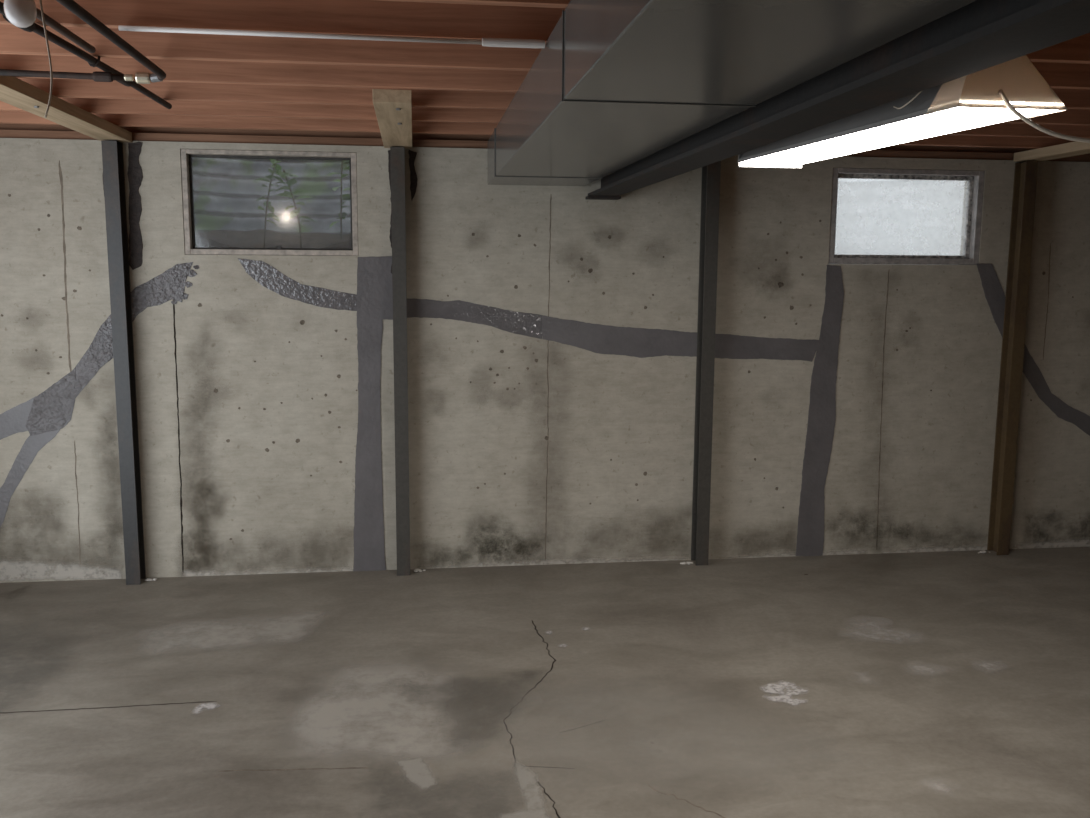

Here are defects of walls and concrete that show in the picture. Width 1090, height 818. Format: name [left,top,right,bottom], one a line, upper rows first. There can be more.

crack [0,262,199,573]
crack [238,256,844,571]
crack [977,263,1090,436]
leakage [185,568,352,576]
leakage [435,554,678,568]
leakage [1018,540,1090,549]
crack [503,620,575,818]